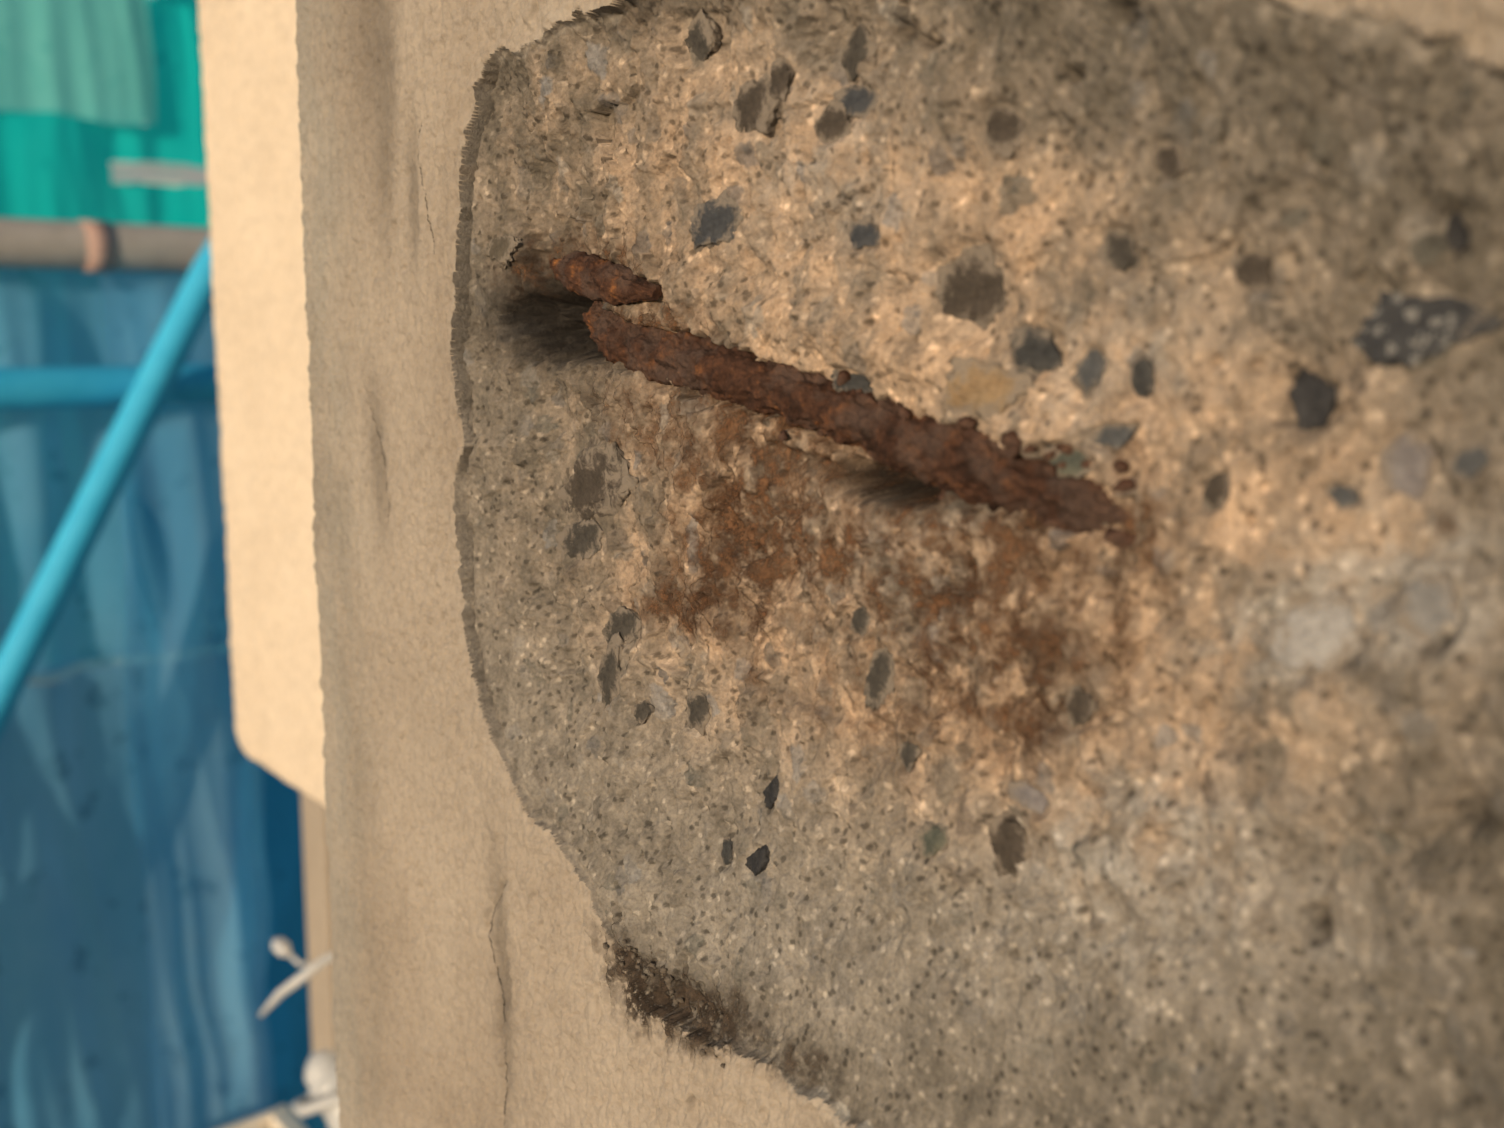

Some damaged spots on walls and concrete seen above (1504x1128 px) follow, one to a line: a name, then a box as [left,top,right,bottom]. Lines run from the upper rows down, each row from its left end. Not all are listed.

rust [623,387,1094,764]
rust [837,370,912,421]
spalling [450,0,1504,1128]
rust [1103,459,1156,597]